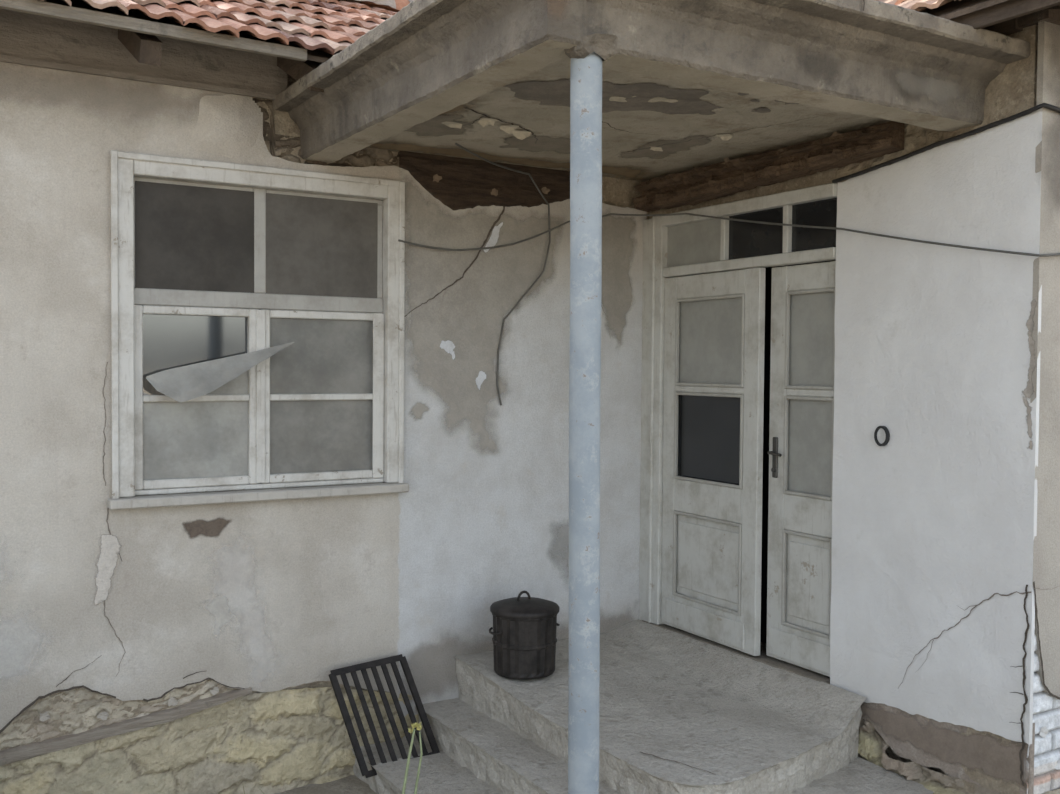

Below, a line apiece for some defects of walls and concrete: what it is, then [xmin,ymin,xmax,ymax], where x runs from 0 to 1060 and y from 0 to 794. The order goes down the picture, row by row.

peeling [504,79,570,107]
peeling [602,81,723,115]
peeling [253,98,570,451]
crack [0,362,126,733]
flaking render [0,680,232,751]
crack [143,671,245,702]
flaking render [862,702,981,787]
crack [898,581,1060,786]
flaking render [1020,634,1060,794]